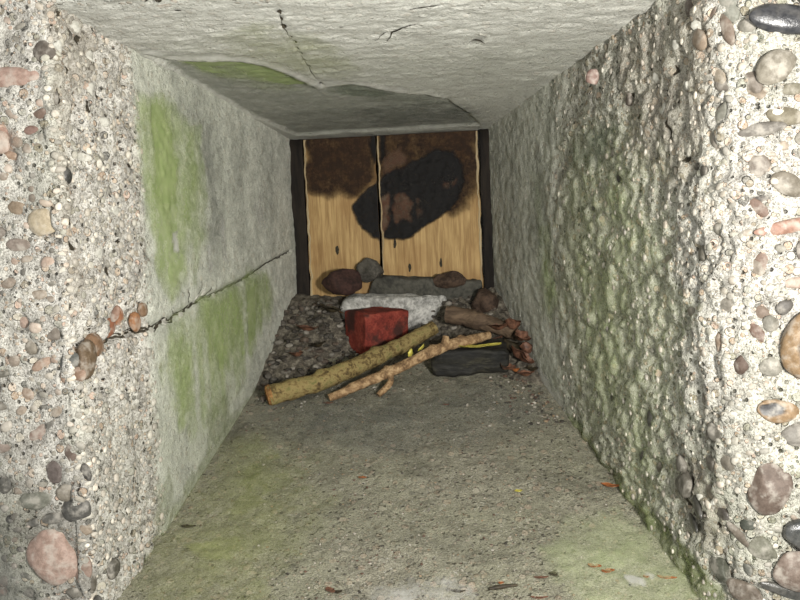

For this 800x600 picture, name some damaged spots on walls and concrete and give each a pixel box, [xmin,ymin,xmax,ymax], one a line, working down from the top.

leakage [136,45,406,93]
crack [277,10,323,84]
crack [102,250,289,343]